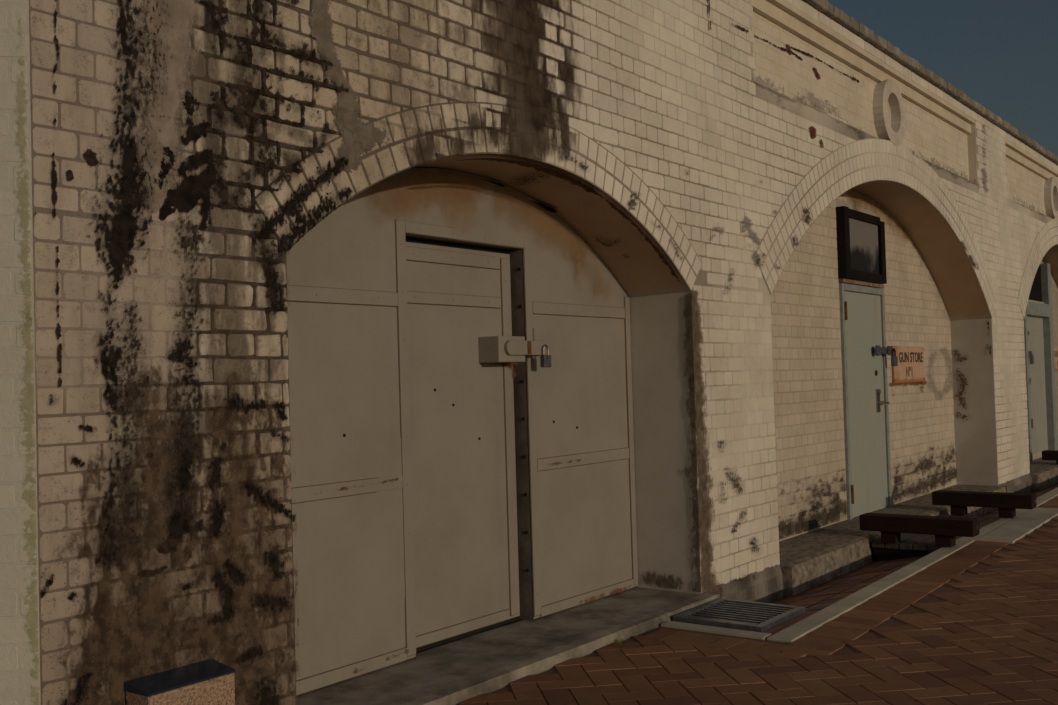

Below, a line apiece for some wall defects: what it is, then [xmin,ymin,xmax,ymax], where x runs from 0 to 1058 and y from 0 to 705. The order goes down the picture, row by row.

damp [197,0,352,314]
damp [409,0,591,170]
crack [708,0,859,82]
damp [62,0,299,705]
damp [643,290,743,594]
damp [778,469,848,540]
damp [892,448,957,504]